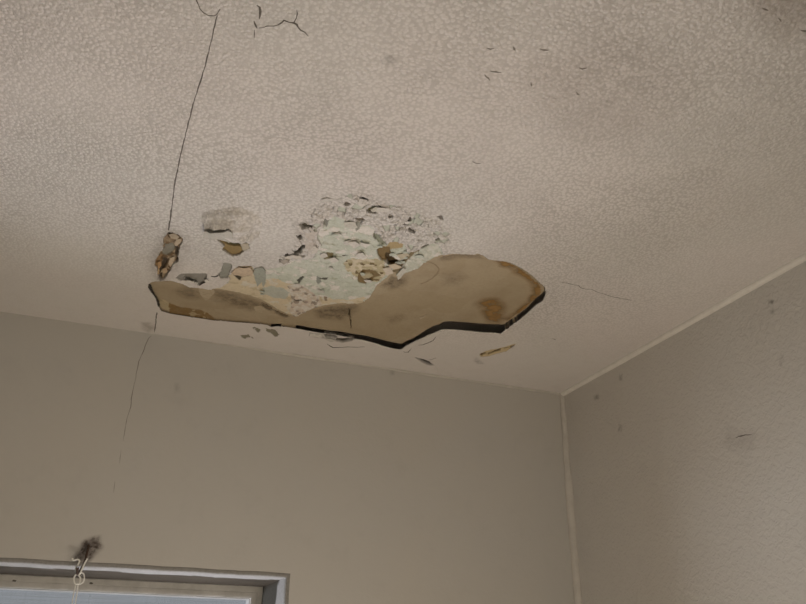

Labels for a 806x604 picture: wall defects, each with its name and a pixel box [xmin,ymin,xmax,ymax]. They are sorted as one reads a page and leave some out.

crack [254,5,308,37]
crack [167,0,220,234]
spalling [148,192,546,348]
crack [119,284,160,463]
spalling [479,344,515,357]